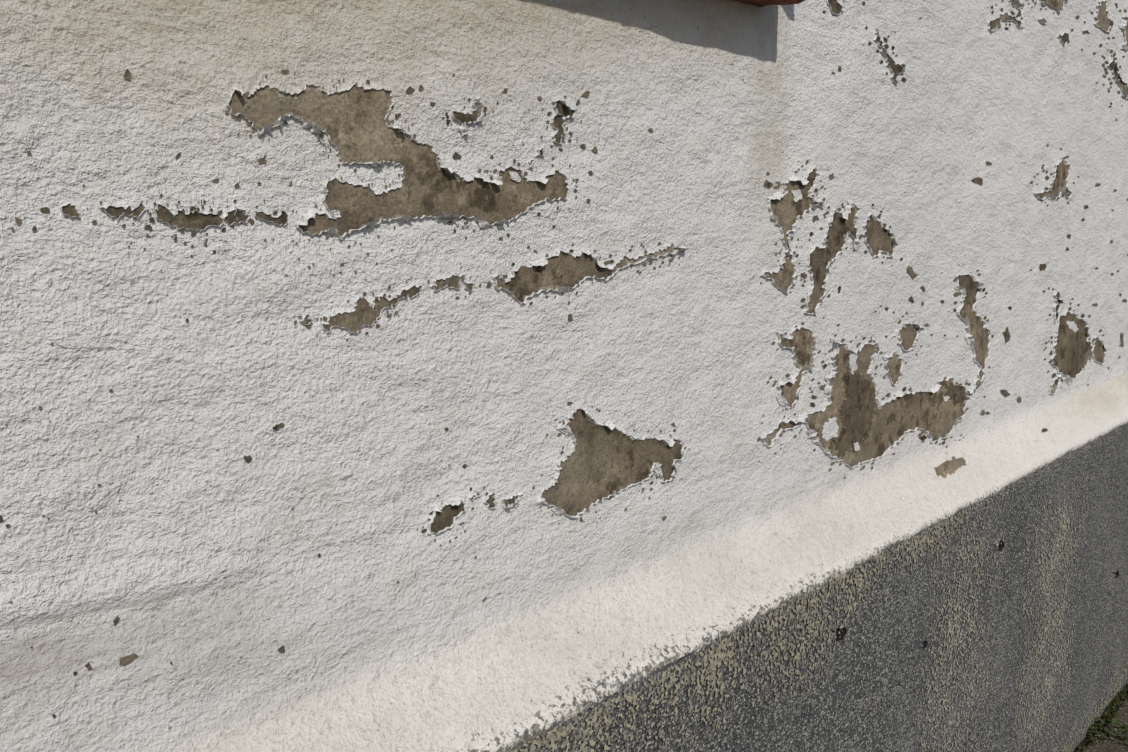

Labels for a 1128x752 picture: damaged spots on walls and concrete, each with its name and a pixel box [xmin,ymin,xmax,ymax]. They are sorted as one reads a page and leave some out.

peeling [987,0,1069,33]
peeling [1057,0,1128,121]
peeling [39,75,598,269]
peeling [1031,144,1079,206]
peeling [294,242,689,341]
peeling [753,160,1010,479]
peeling [1039,287,1124,394]
peeling [417,402,690,546]